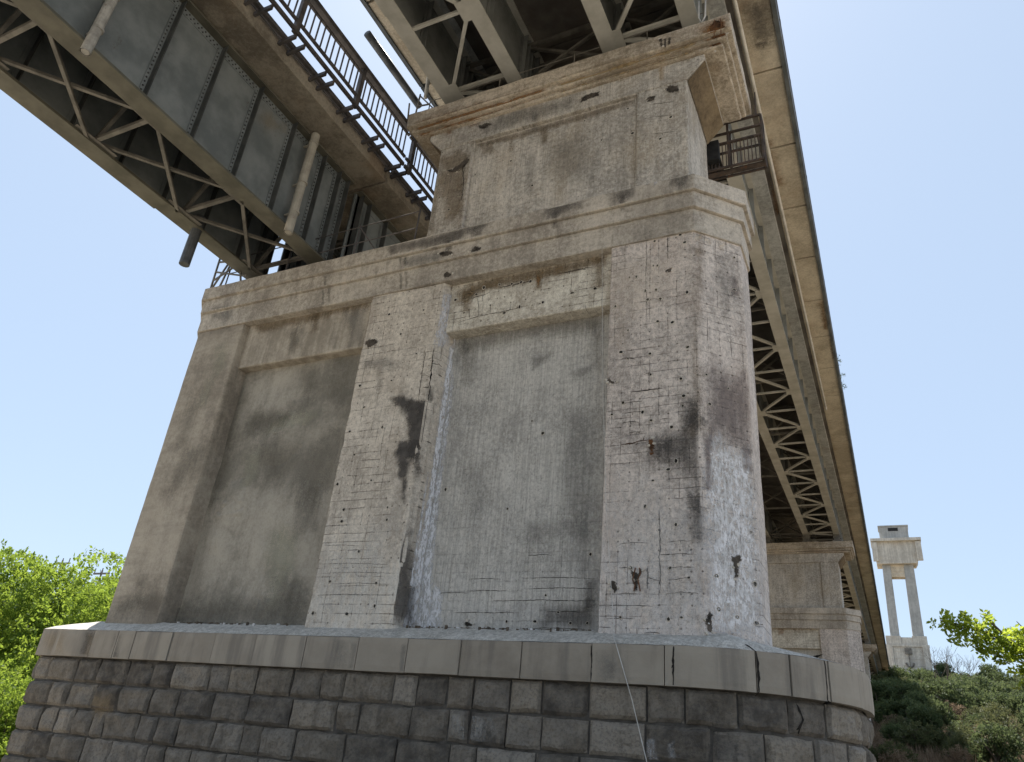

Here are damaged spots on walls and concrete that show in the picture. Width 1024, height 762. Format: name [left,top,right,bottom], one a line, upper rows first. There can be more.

water stain [393,257,602,628]
water stain [654,378,747,471]
crack [446,513,690,685]
crack [745,624,763,696]